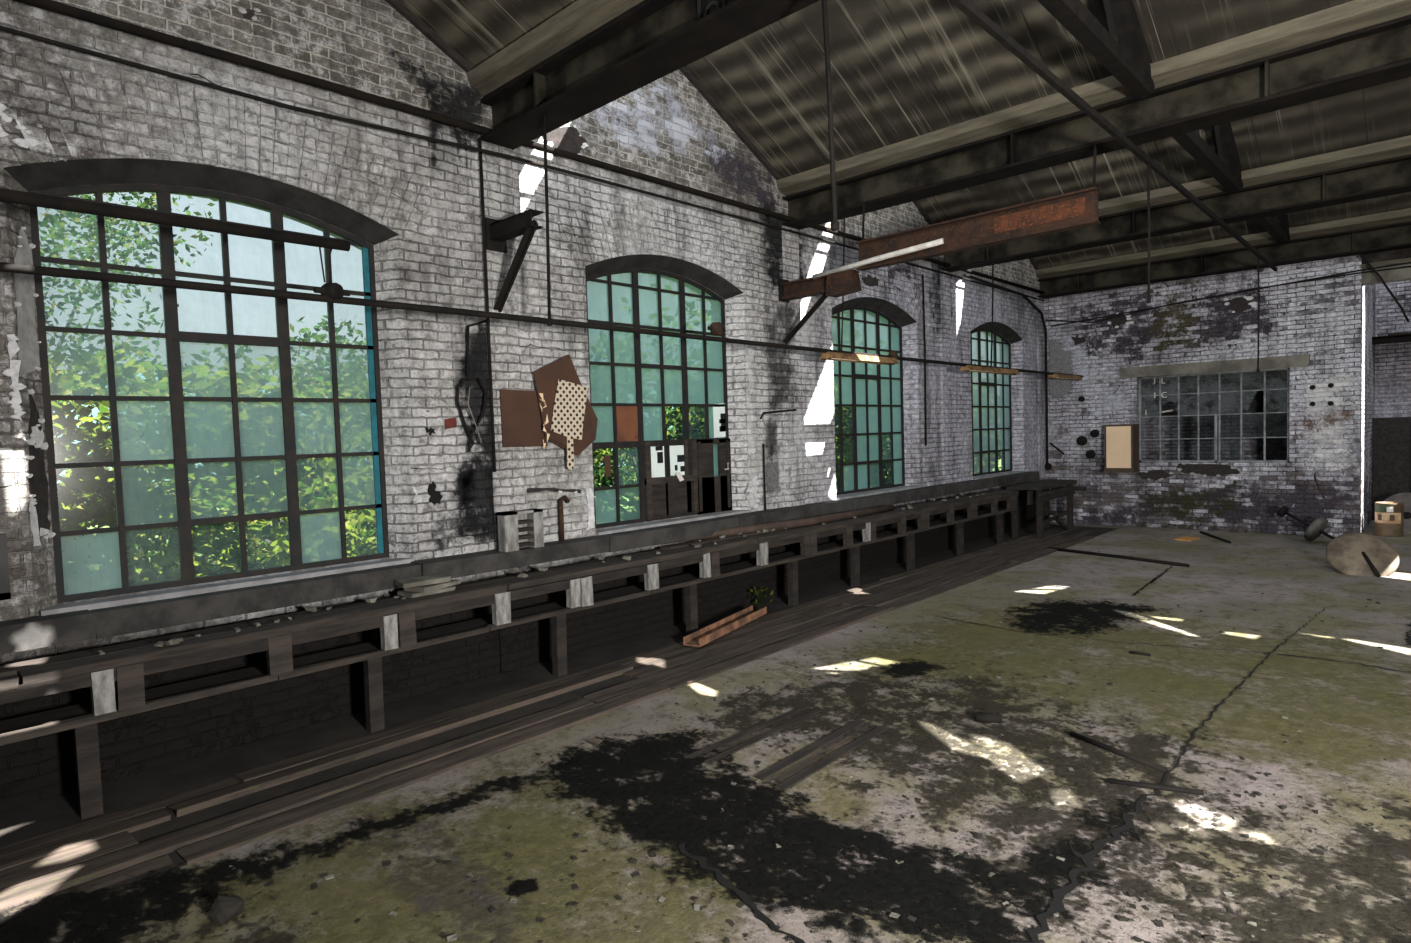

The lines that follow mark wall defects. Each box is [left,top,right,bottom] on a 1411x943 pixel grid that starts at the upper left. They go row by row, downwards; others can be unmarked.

rust [994,197,1085,234]
peeling [1071,283,1166,368]
peeling [1184,278,1296,355]
crack [934,608,1411,943]
crack [678,843,805,943]